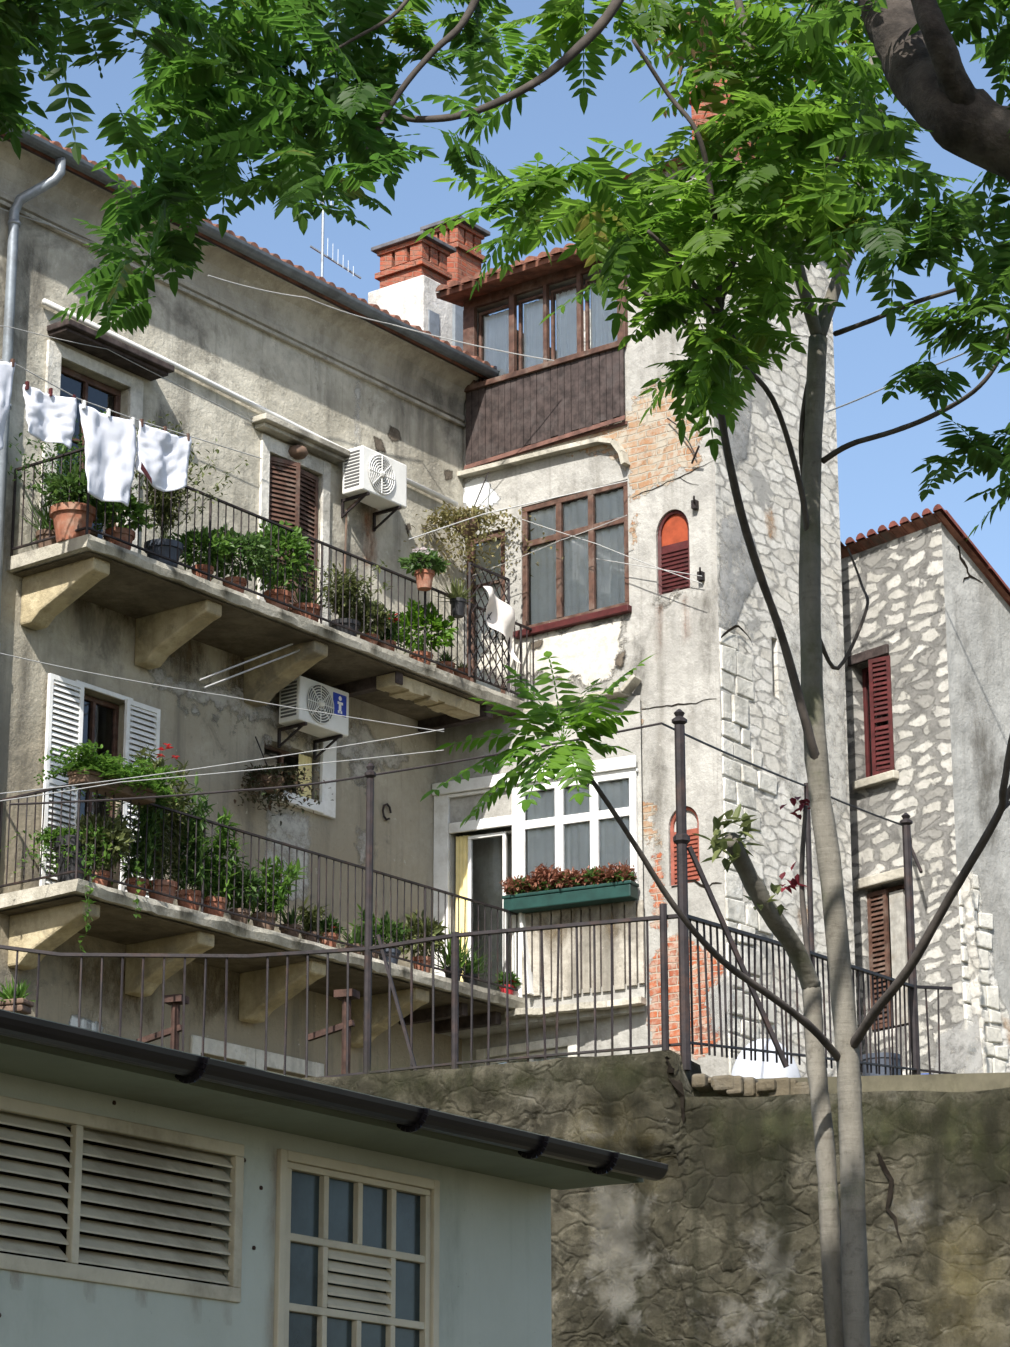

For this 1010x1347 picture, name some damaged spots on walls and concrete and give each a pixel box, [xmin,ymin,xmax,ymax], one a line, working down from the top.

flaking render [552,373,752,545]
flaking render [642,801,723,1060]
crack [877,1153,902,1242]